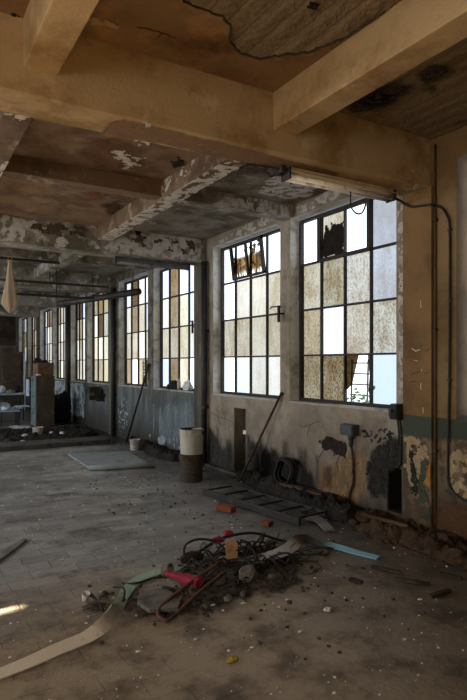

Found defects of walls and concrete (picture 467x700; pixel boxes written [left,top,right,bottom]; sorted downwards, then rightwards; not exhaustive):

spalling [183,0,399,61]
leakage [349,83,413,113]
peeling [111,150,146,170]
peeling [0,214,54,242]
peeling [95,157,342,261]
flaking render [318,436,347,476]
peeling [449,449,467,499]